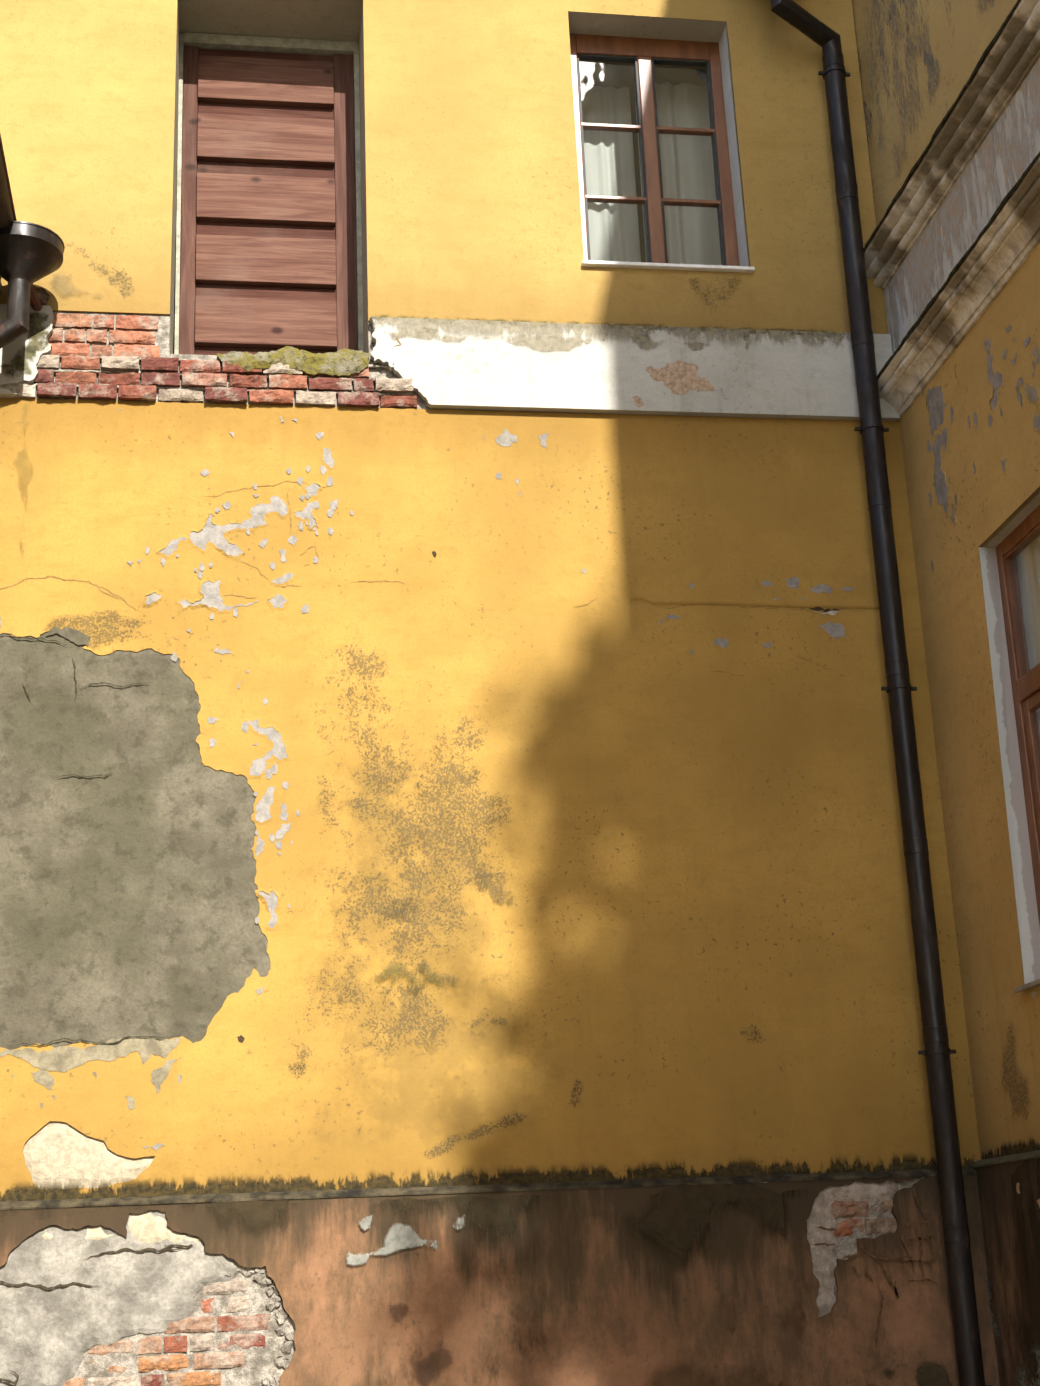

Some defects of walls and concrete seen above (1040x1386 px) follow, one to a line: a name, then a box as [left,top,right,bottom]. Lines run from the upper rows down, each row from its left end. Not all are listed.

damp [886,57,1040,348]
peeling [127,432,354,619]
crack [637,601,876,615]
peeling [241,698,300,857]
flaking render [11,1070,165,1189]
peeling [85,1226,113,1240]
peeling [128,1211,200,1244]
peeling [347,1223,438,1265]
damp [0,1156,937,1265]
spalling [806,1177,925,1318]
damp [962,1140,1040,1386]
damp [368,1344,452,1386]